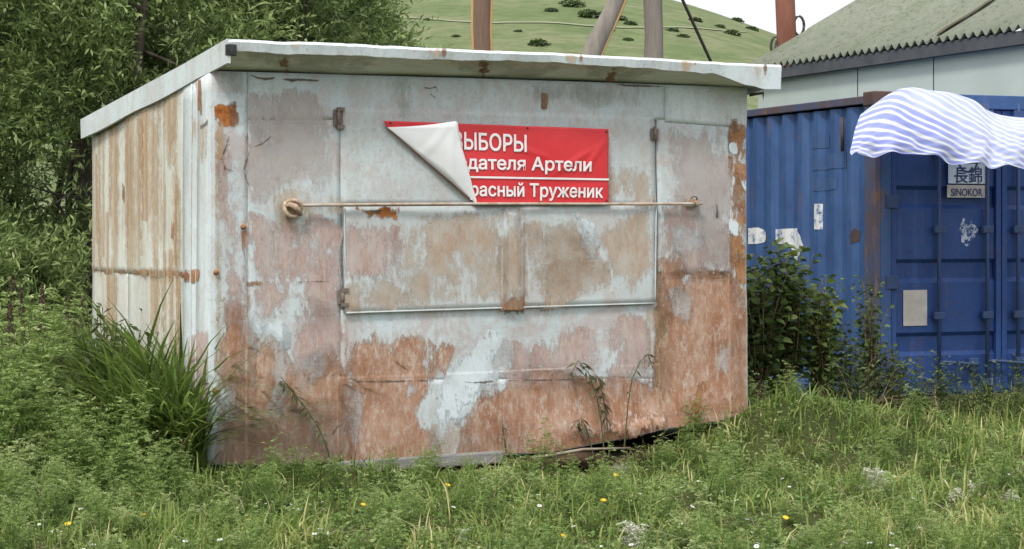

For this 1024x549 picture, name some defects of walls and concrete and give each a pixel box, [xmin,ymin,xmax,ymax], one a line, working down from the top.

corrosion [94,93,200,362]
corrosion [193,79,239,217]
corrosion [356,206,400,220]
peeling [188,125,747,464]
corrosion [497,119,747,450]